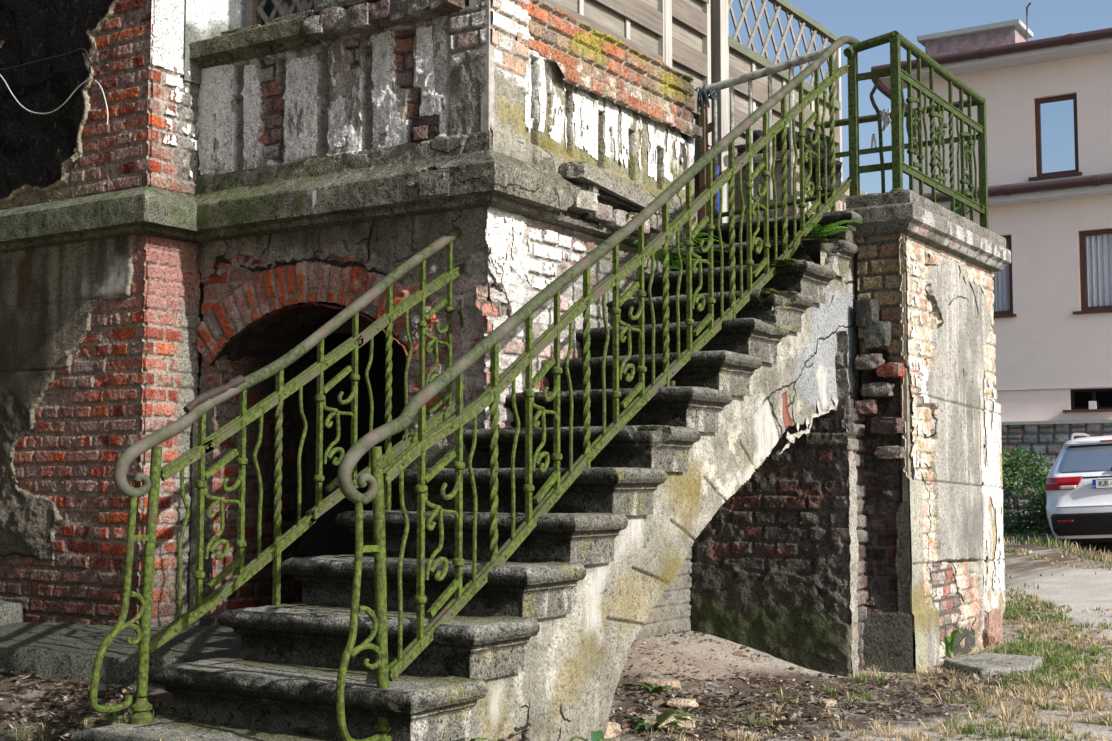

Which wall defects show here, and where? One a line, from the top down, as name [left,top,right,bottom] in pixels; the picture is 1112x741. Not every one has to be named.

flaking render [0,0,440,210]
flaking render [516,0,702,235]
flaking render [0,234,151,629]
peeling [475,210,586,317]
crack [746,280,855,433]
peeling [978,368,1005,592]
flaking render [930,561,961,641]
spalling [982,608,1003,645]